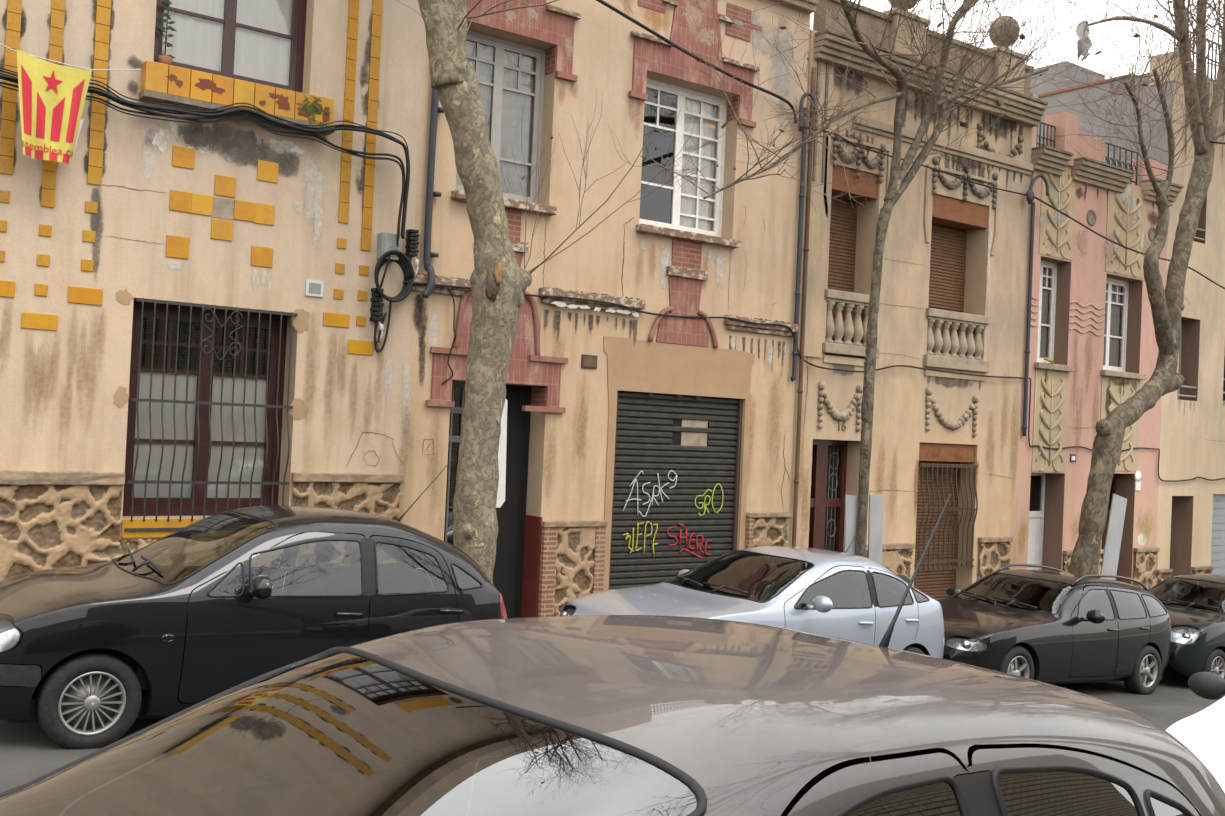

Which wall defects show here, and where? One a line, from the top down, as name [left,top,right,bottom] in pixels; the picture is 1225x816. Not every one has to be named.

damp [3,9,26,36]
damp [143,123,322,240]
peeling [551,301,639,317]